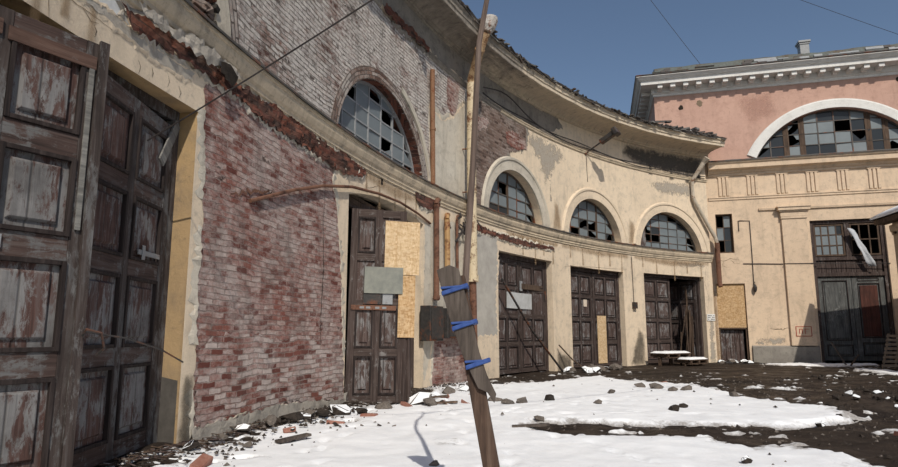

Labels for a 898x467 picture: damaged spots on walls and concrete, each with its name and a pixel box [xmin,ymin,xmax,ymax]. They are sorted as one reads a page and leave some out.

flaking render [236,0,563,205]
flaking render [78,0,367,440]
peeling [414,190,465,308]
peeling [468,224,555,340]